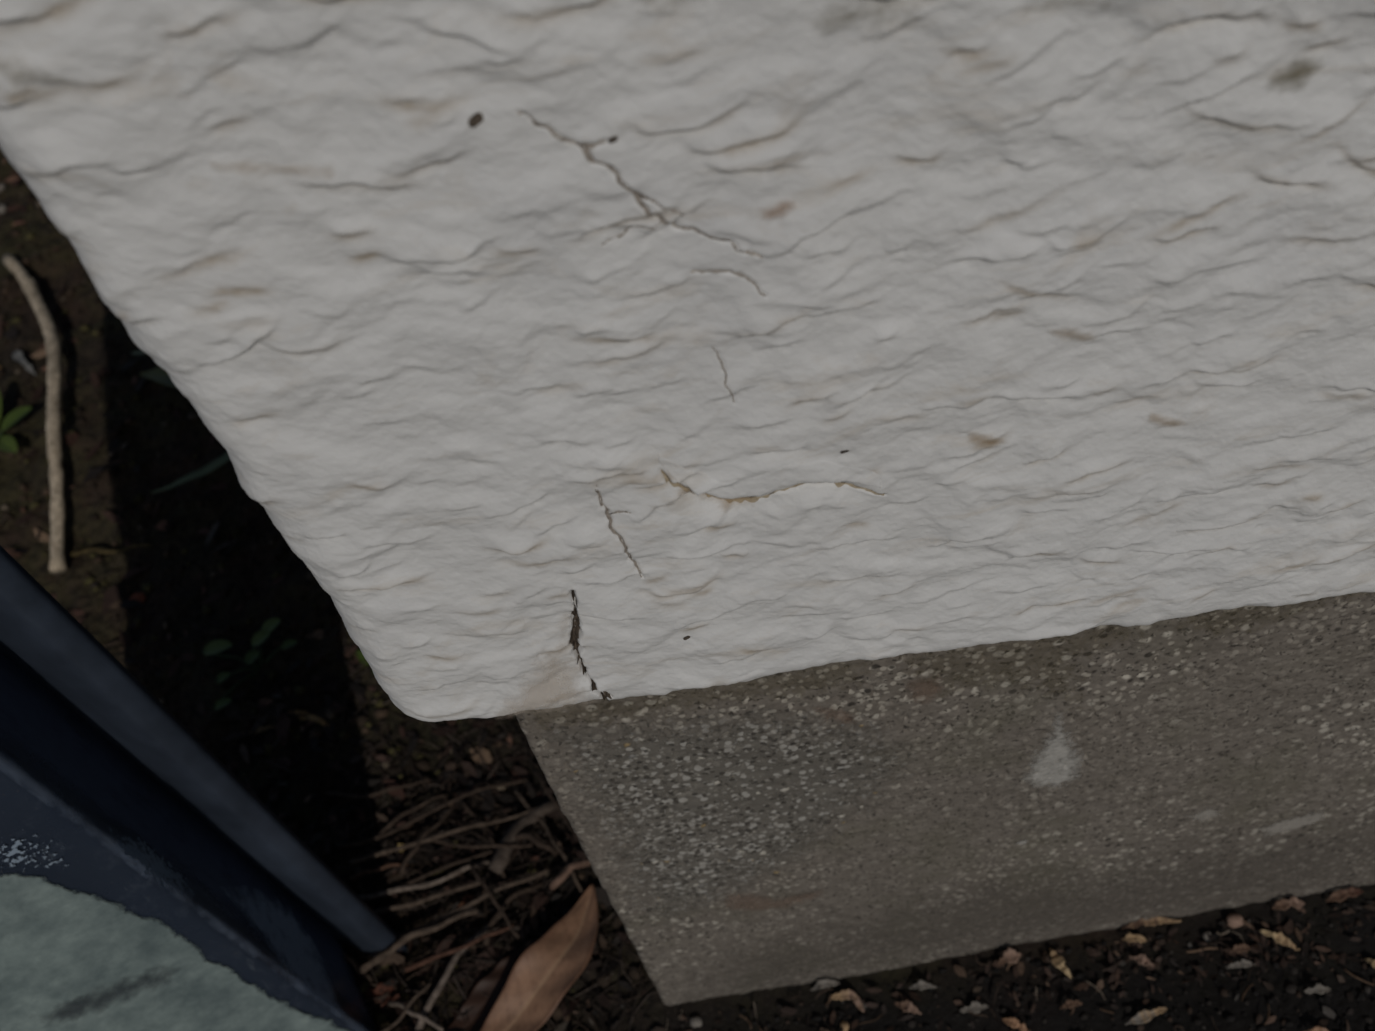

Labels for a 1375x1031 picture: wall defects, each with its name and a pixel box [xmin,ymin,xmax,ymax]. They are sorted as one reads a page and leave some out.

crack [516,111,767,296]
crack [595,485,642,578]
crack [569,590,613,703]